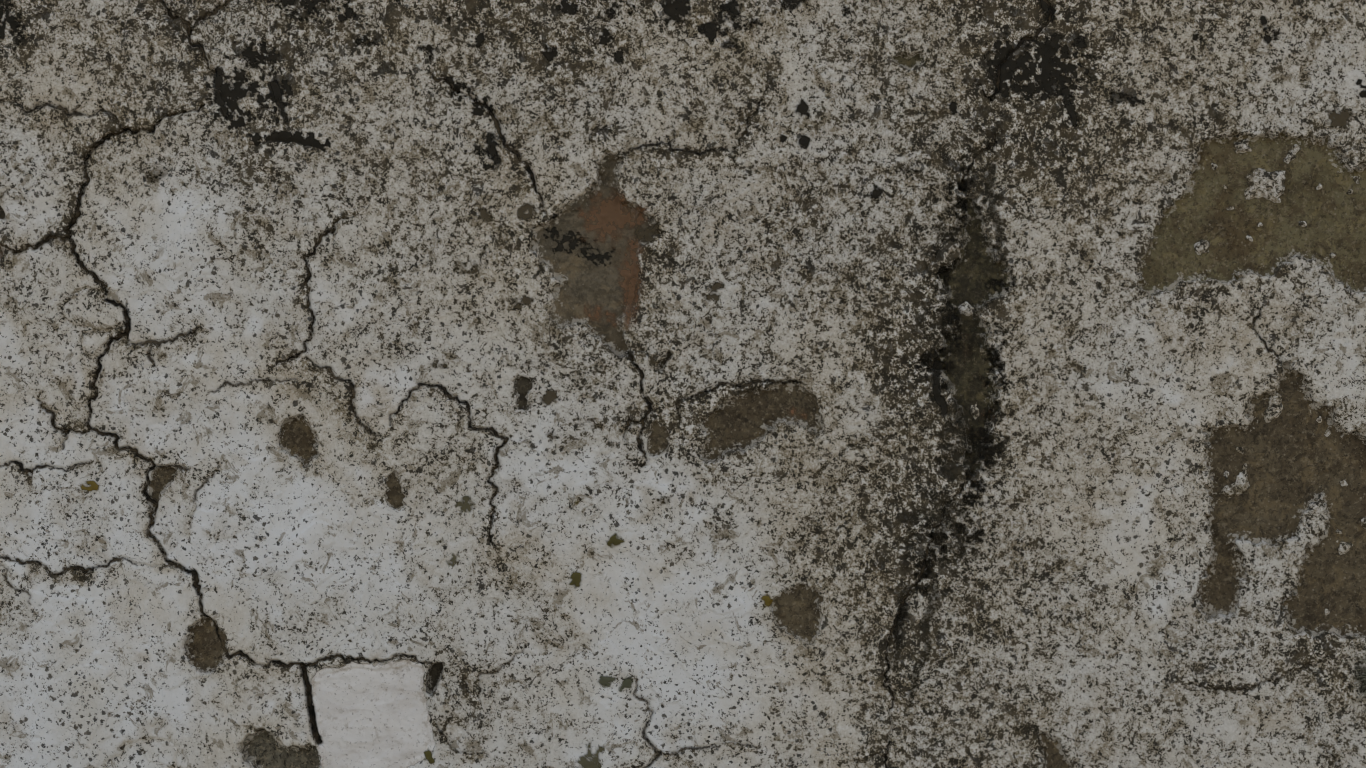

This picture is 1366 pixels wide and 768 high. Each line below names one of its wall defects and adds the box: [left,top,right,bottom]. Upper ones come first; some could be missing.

crack [157,0,233,72]
crack [432,74,547,214]
crack [963,0,1056,179]
rust [578,187,647,328]
spalling [1137,132,1366,299]
crack [0,100,432,744]
crack [210,216,509,543]
spalling [697,380,823,463]
spalling [1194,362,1366,638]
spalling [238,660,445,768]
crack [436,643,526,753]